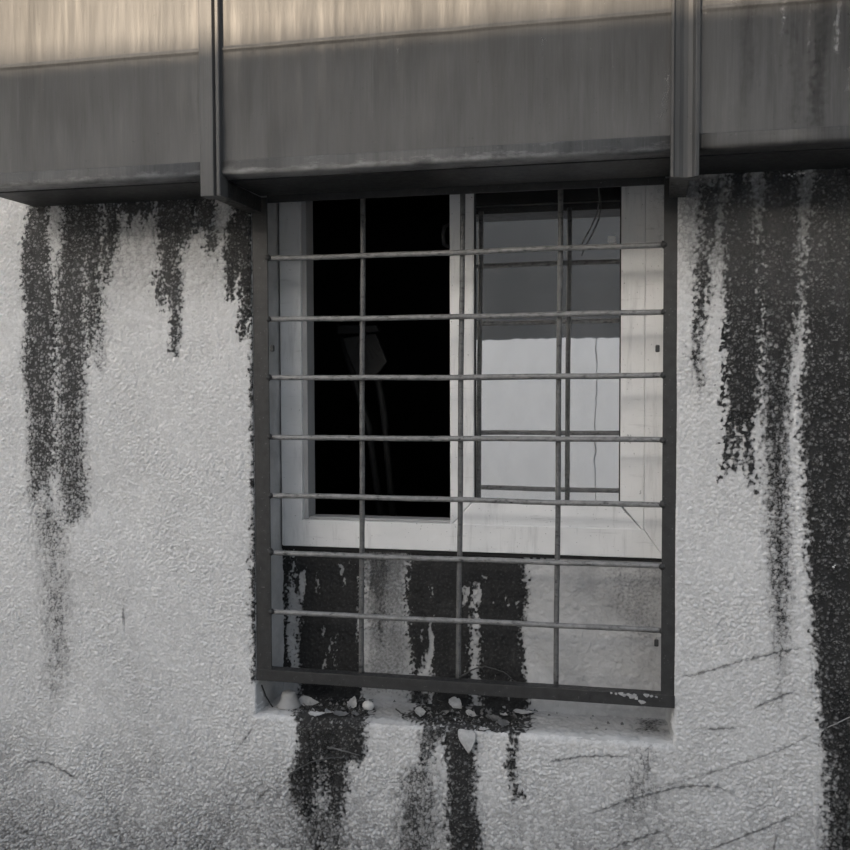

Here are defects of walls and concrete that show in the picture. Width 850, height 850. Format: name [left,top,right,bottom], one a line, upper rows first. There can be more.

damp [19,199,257,683]
damp [685,168,850,850]
damp [282,549,547,682]
damp [287,683,376,850]
damp [396,690,538,850]